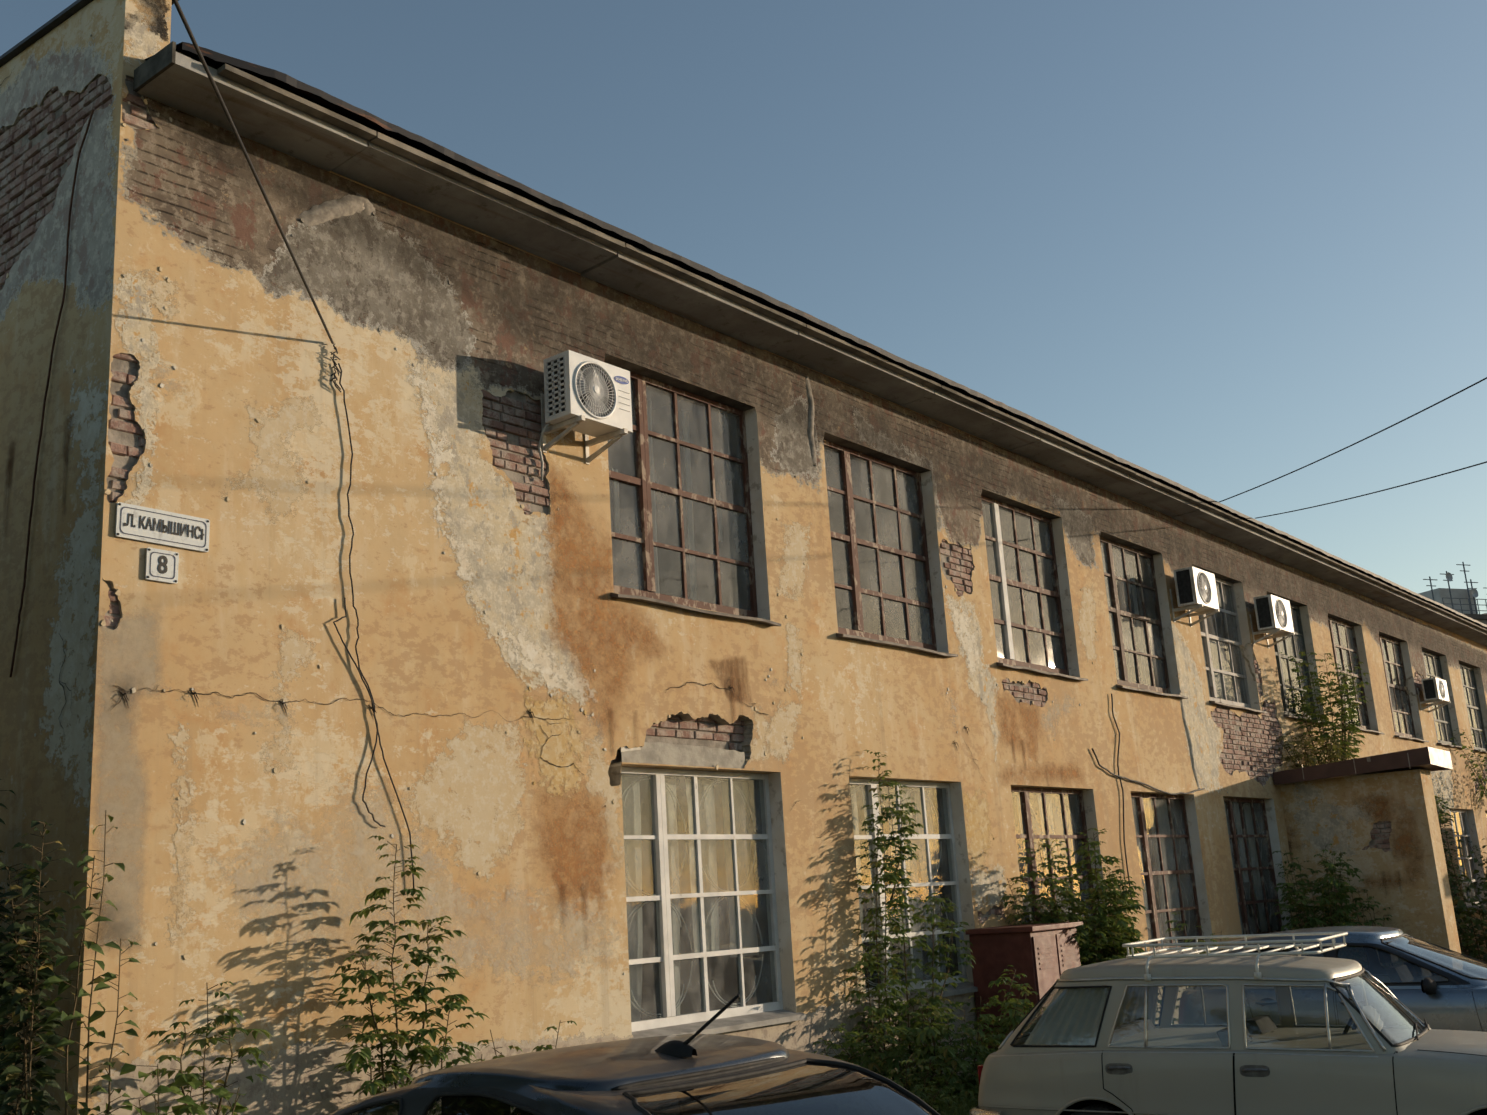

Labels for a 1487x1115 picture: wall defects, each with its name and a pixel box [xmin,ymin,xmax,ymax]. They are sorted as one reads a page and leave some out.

peeling [123,7,171,65]
flaking render [0,38,1487,929]
crack [110,684,584,775]
damp [542,800,605,905]
peeling [366,929,529,985]
flaking render [86,1030,633,1115]
flaking render [718,992,978,1080]
flaking render [1155,986,1192,1024]